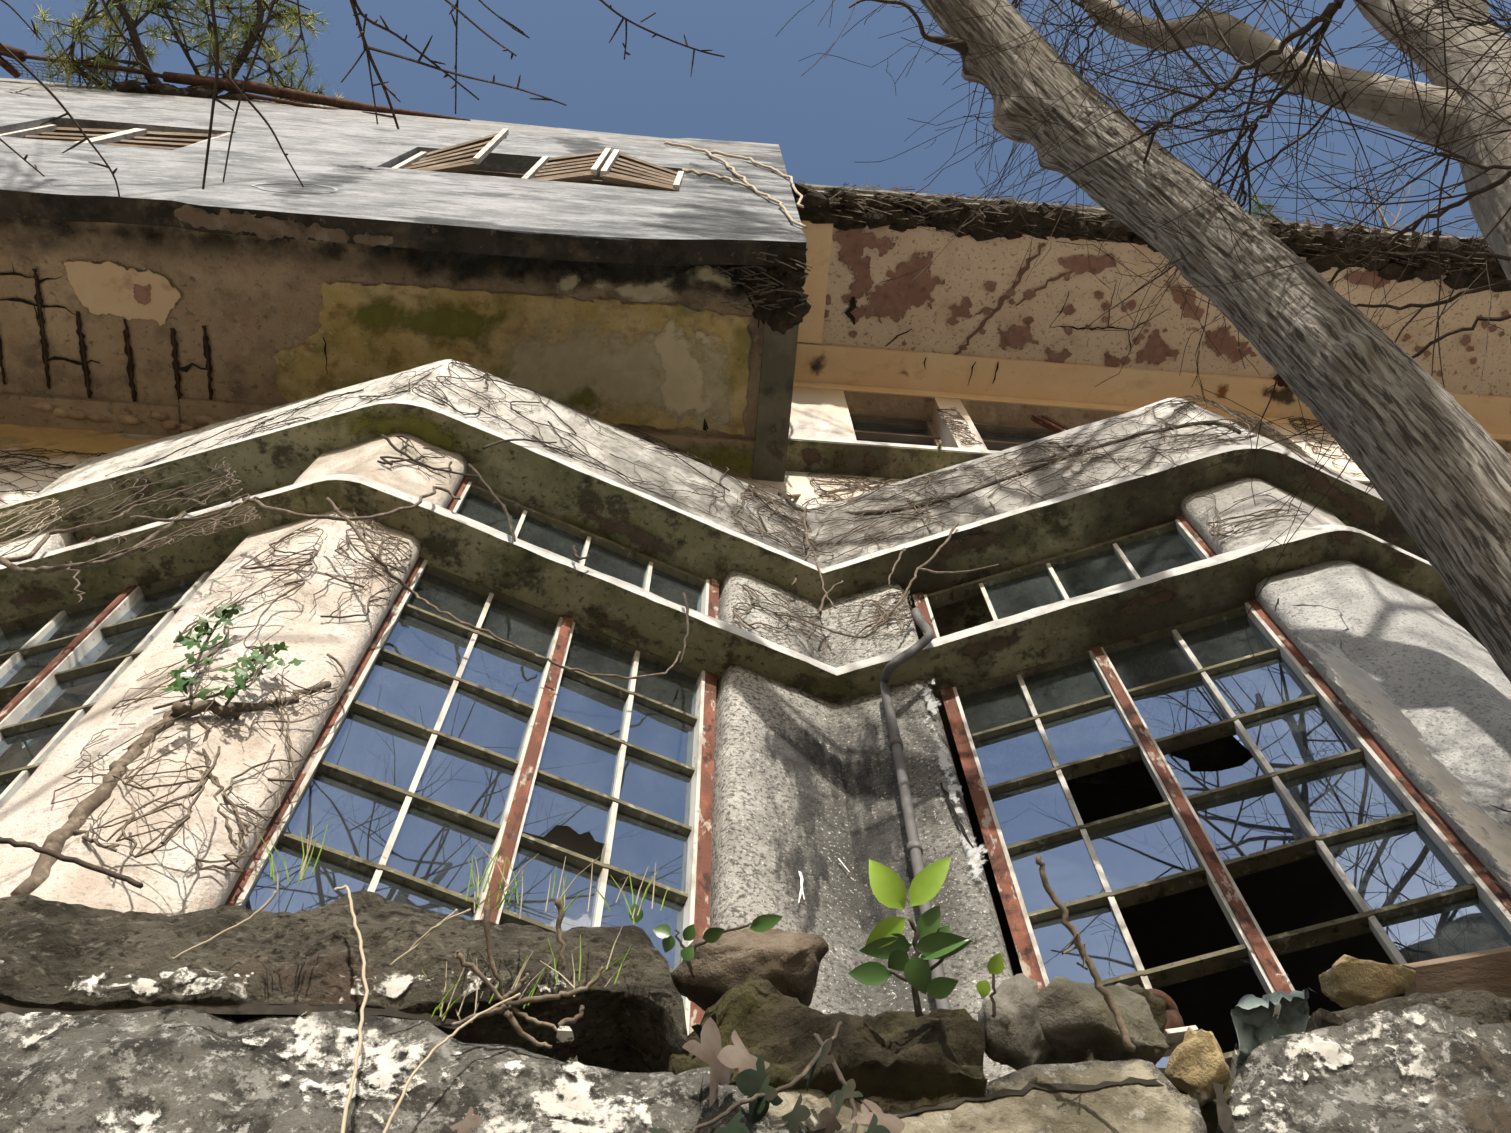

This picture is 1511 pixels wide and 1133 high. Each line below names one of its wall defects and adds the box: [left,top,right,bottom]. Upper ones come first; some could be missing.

crack [0,264,100,365]
spalling [30,268,223,432]
crack [179,363,207,372]
crack [844,297,856,325]
spalling [708,225,1136,363]
crack [886,243,1169,384]
leakage [765,720,911,933]